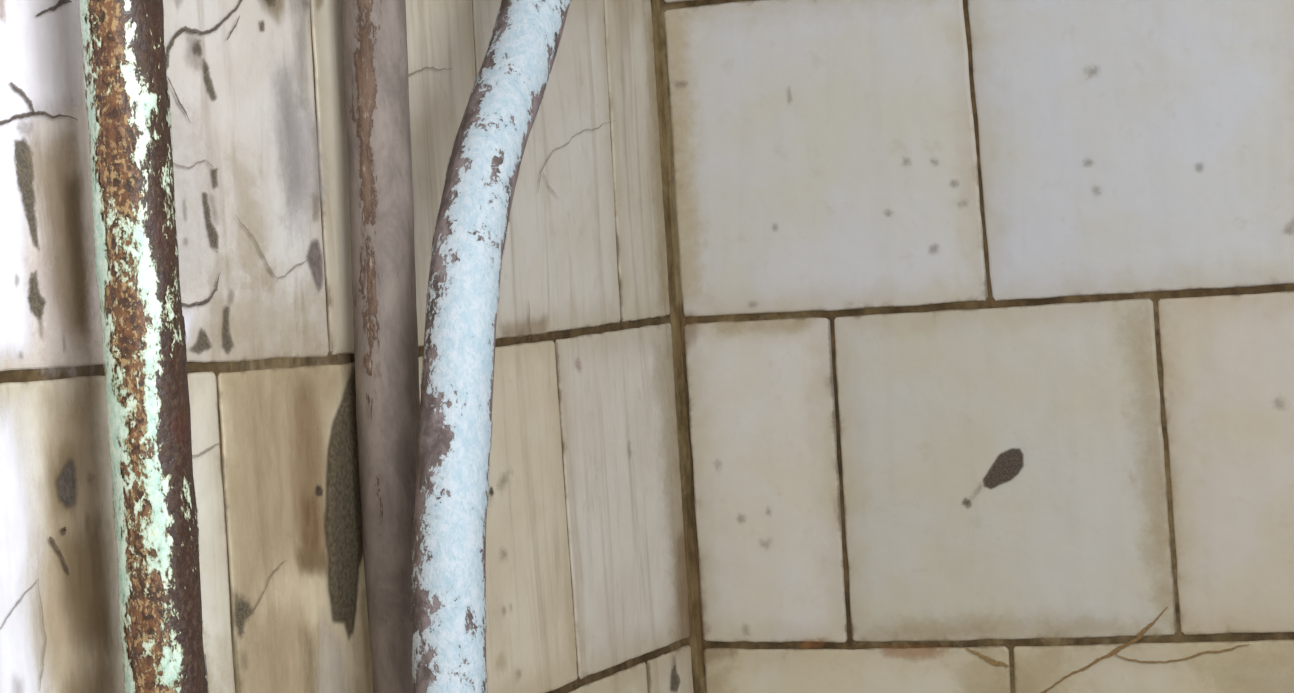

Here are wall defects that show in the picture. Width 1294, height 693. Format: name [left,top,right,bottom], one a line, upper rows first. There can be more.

crack [0,82,77,125]
crack [166,0,242,124]
corrosion [349,0,382,376]
crack [182,272,221,307]
peeling [411,0,572,693]
crack [966,648,1009,667]
crack [1041,606,1250,693]